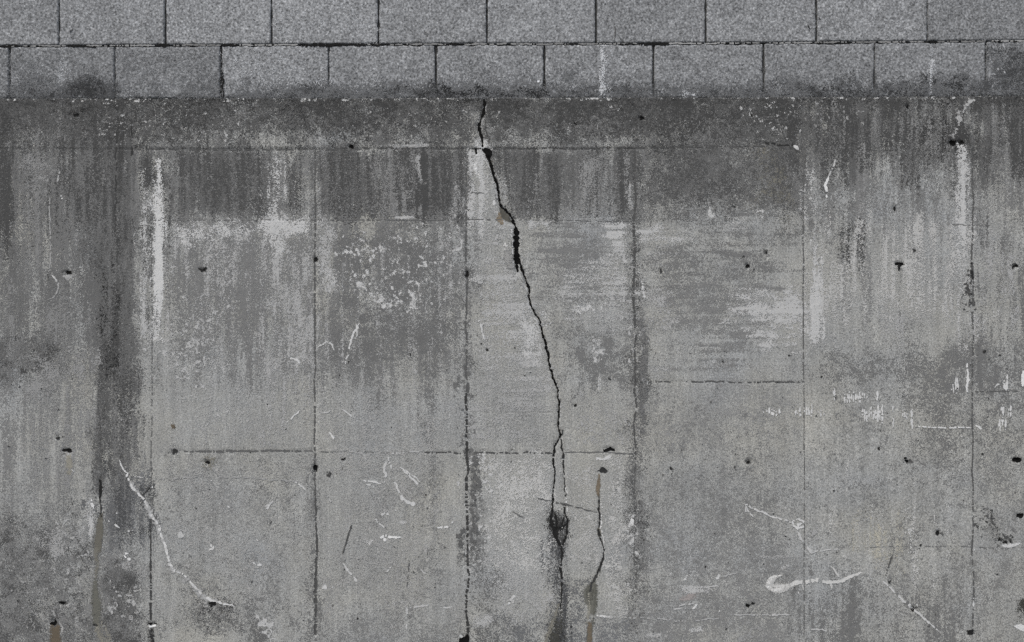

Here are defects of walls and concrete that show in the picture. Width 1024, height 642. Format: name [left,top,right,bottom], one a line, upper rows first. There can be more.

crack [477,99,605,609]